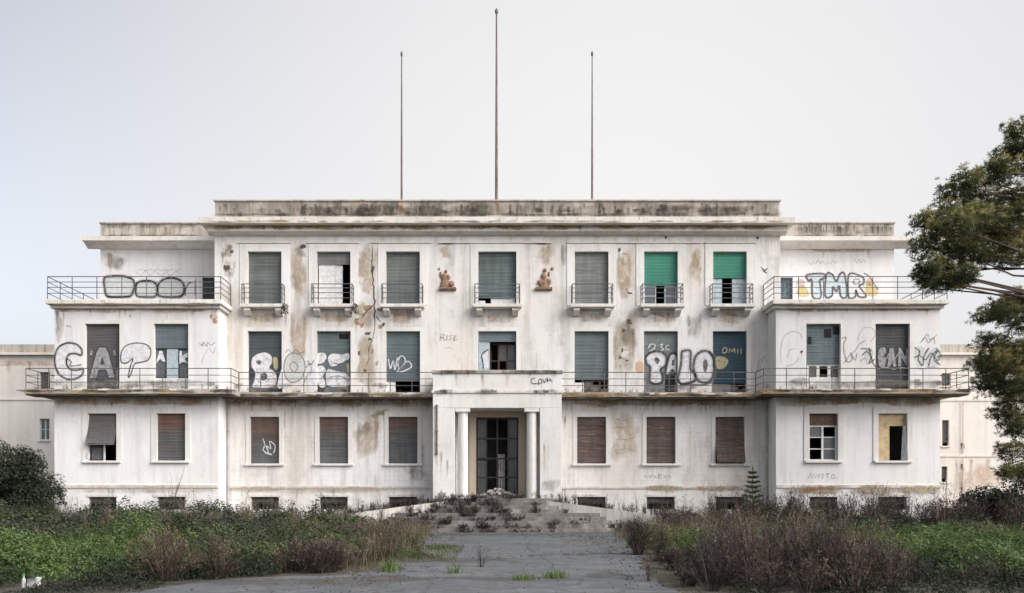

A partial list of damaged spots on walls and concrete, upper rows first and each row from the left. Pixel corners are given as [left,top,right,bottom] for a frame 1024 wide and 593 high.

damp [214,203,342,230]
damp [349,203,393,229]
damp [401,202,456,230]
damp [465,203,539,230]
damp [548,206,582,229]
damp [596,206,631,229]
crack [362,244,381,364]
peeling [354,304,385,383]